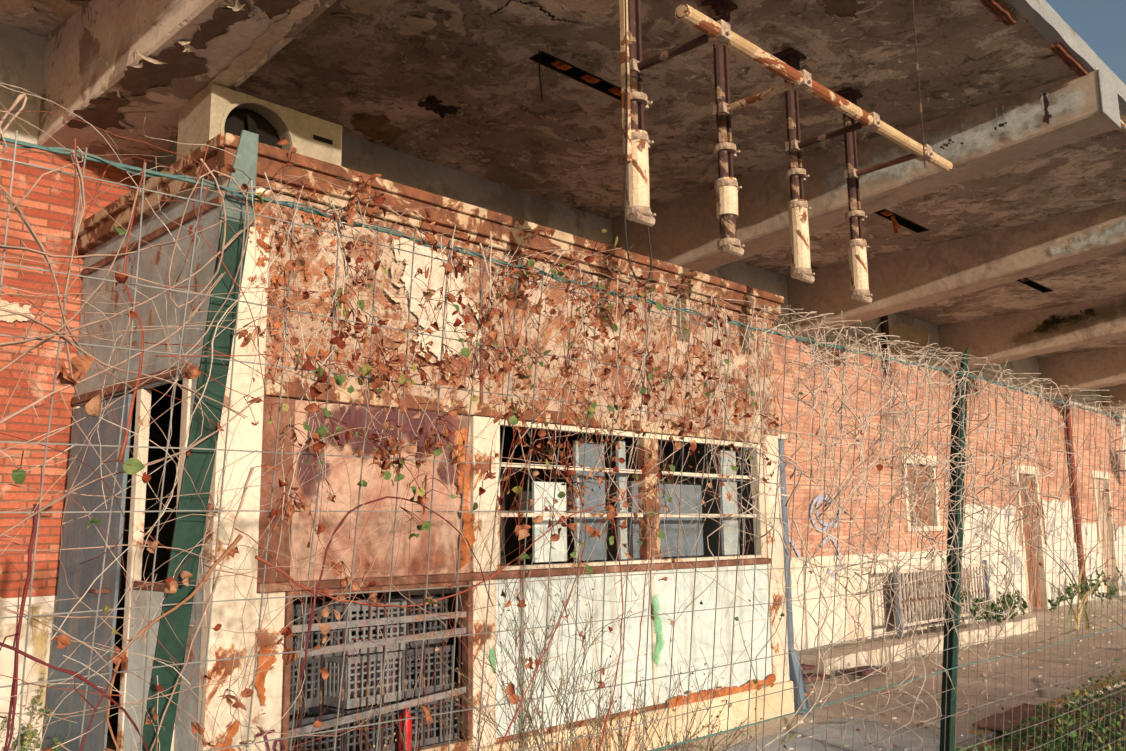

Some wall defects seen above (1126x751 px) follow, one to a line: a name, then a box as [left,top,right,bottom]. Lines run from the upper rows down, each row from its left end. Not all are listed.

peeling [391,0,466,36]
crack [490,0,579,24]
peeling [816,0,869,20]
spalling [980,0,1017,26]
peeling [67,0,320,133]
spalling [1049,42,1089,77]
spalling [418,95,461,119]
spalling [350,113,412,146]
leakage [1016,304,1124,341]
rust [667,674,776,708]